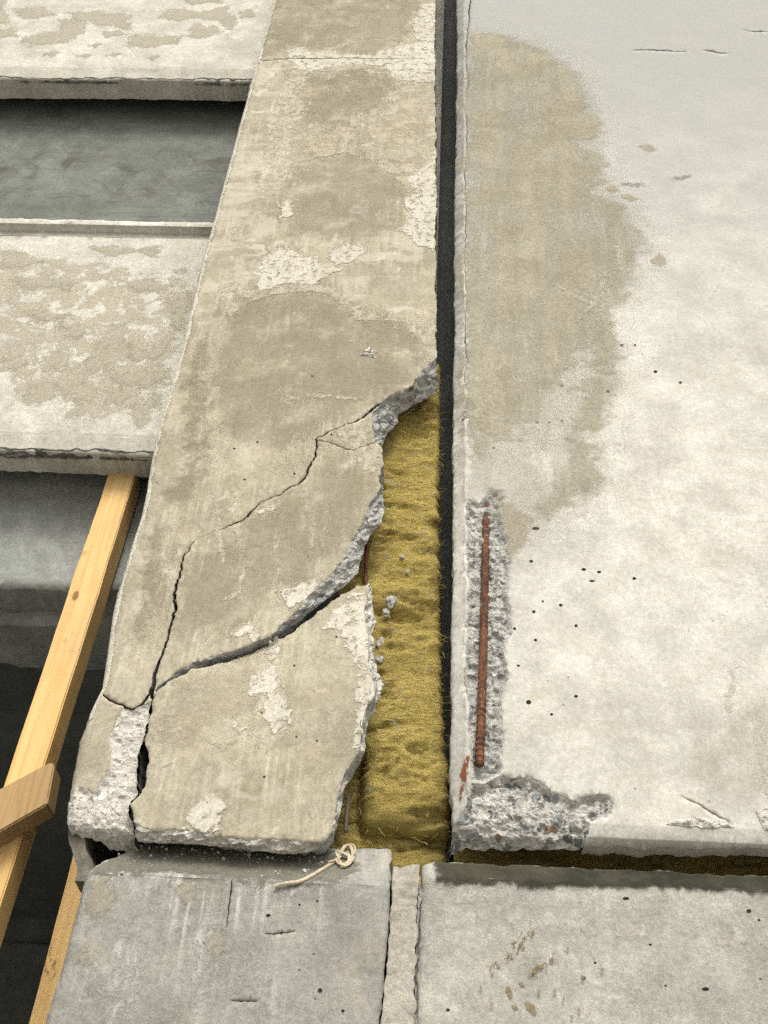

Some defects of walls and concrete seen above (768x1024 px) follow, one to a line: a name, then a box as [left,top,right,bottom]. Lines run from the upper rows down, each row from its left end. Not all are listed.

spalling [67,582,384,854]
crack [103,484,385,711]
crack [224,405,378,529]
spalling [332,358,439,472]
spalling [450,489,614,855]
water stain [455,34,636,552]